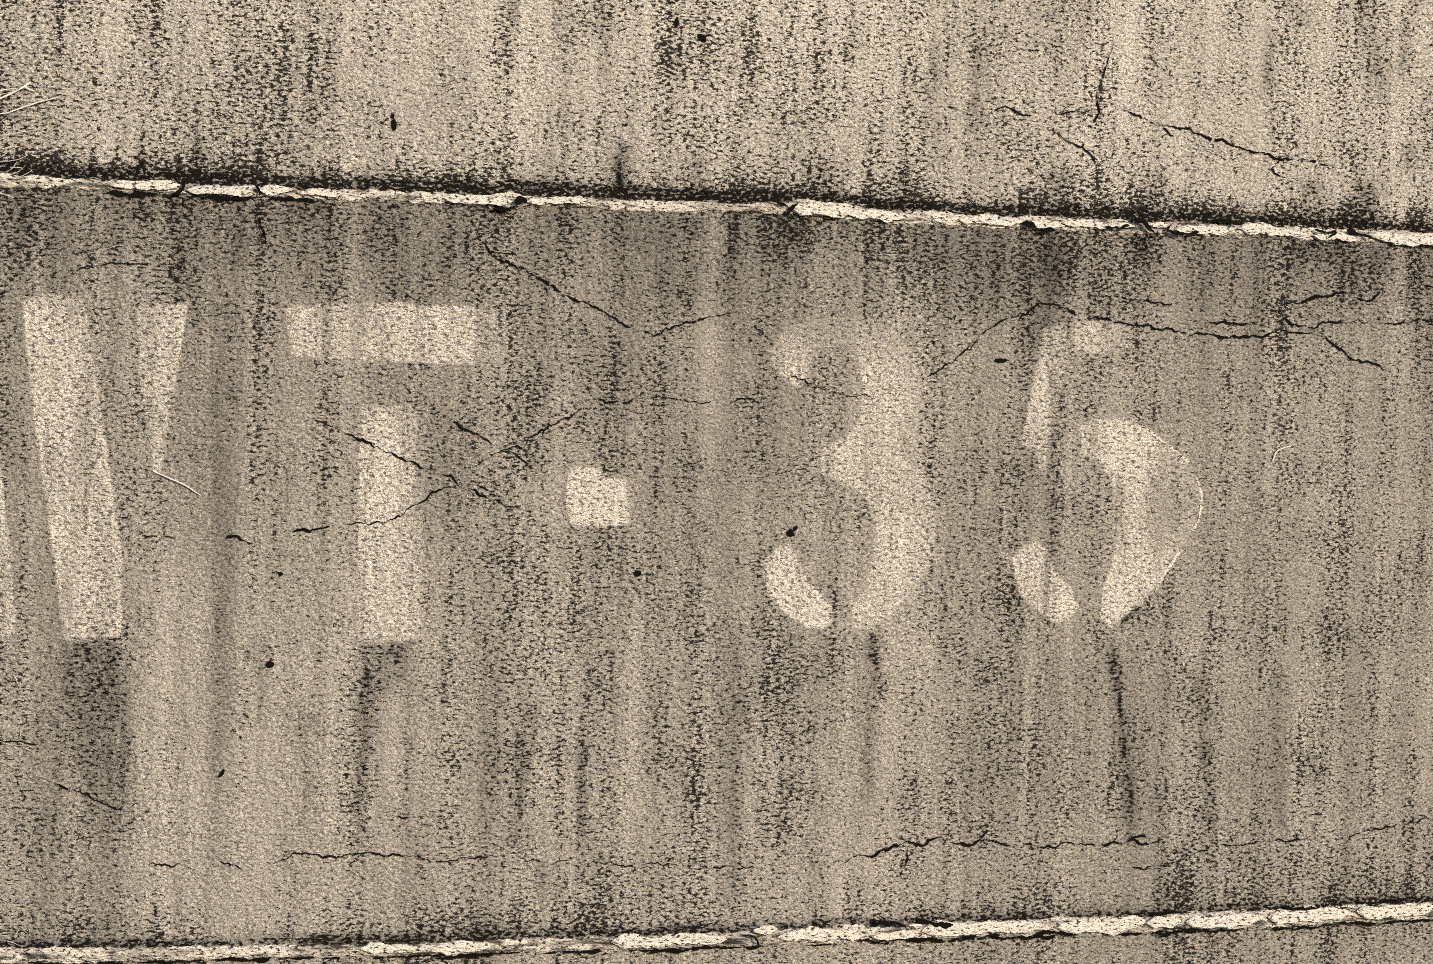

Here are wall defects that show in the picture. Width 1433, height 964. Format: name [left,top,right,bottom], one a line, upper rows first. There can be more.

crack [948,45,1329,180]
damp [1350,180,1387,225]
crack [478,238,737,337]
crack [927,285,1433,377]
crack [294,369,894,533]
crack [225,535,252,544]
damp [63,642,130,837]
damp [353,643,408,821]
damp [722,649,749,891]
damp [862,633,882,782]
damp [1106,645,1137,848]
crack [834,816,1426,876]